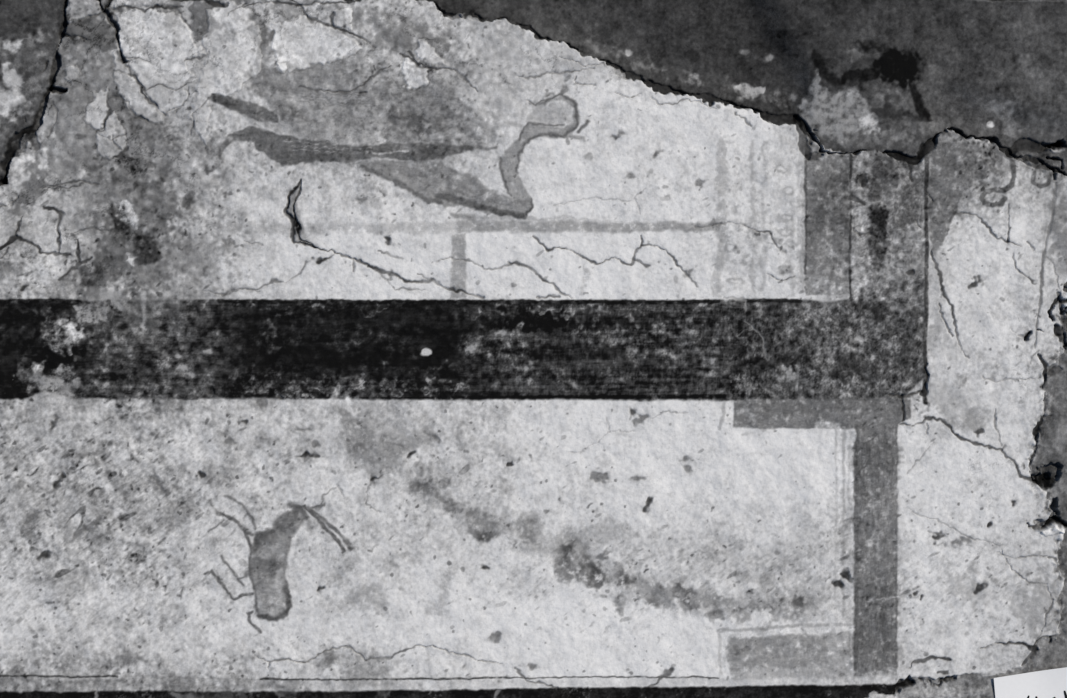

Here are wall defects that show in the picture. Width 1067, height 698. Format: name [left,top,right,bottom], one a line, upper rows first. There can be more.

peeling [67,0,101,23]
peeling [0,31,51,158]
peeling [65,66,82,83]
peeling [86,0,362,160]
crack [0,0,479,282]
peeling [403,39,449,90]
peeling [828,78,930,155]
crack [202,179,768,360]
crack [434,2,1067,484]
spalling [1054,295,1067,350]
spalling [1026,462,1067,537]